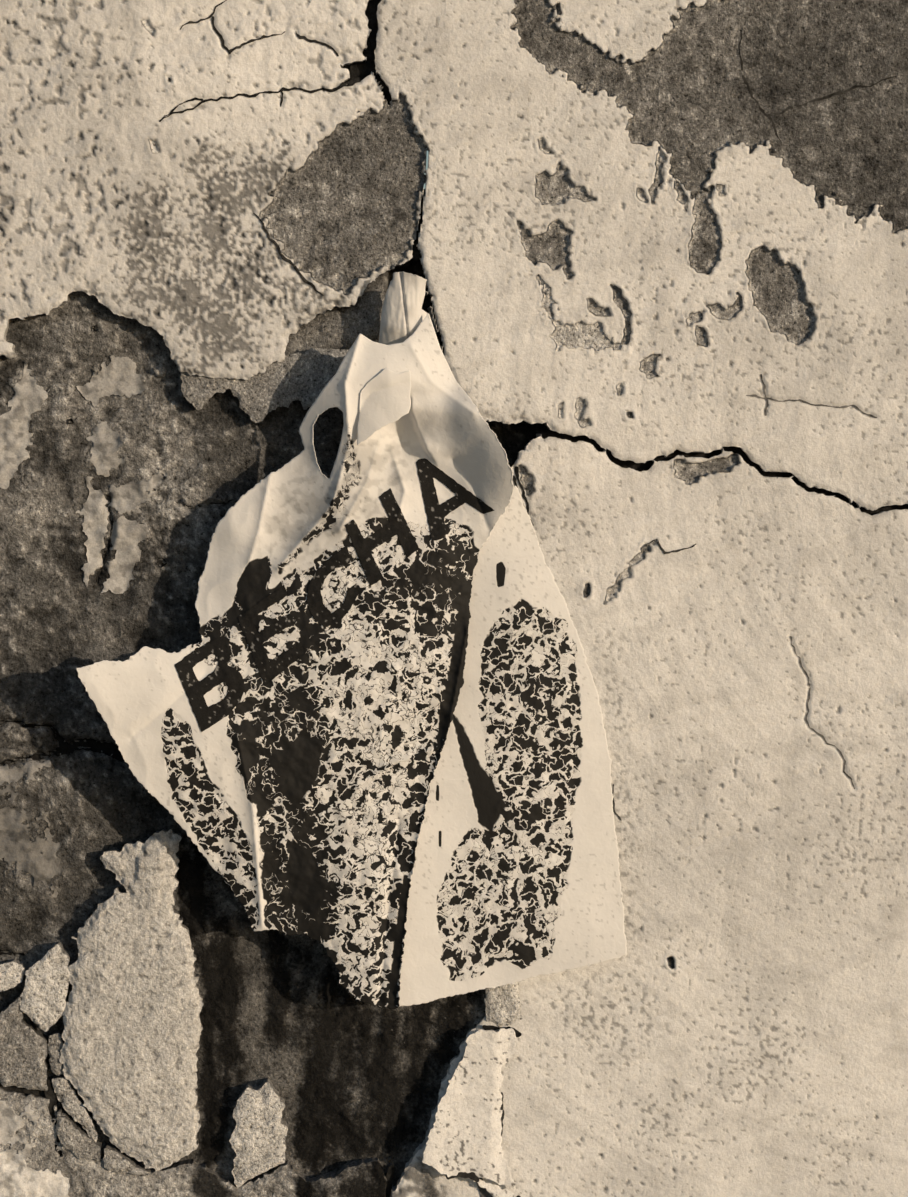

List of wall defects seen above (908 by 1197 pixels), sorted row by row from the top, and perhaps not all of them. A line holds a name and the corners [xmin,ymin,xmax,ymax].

crack [159,0,392,122]
crack [253,213,324,296]
spalling [259,93,429,295]
crack [412,197,423,260]
peeling [517,137,632,352]
peeling [510,0,908,275]
peeling [687,245,817,347]
crack [540,429,908,516]
crack [0,718,126,766]
damp [176,840,247,1197]
damp [263,929,479,1197]
peeling [422,1028,521,1197]